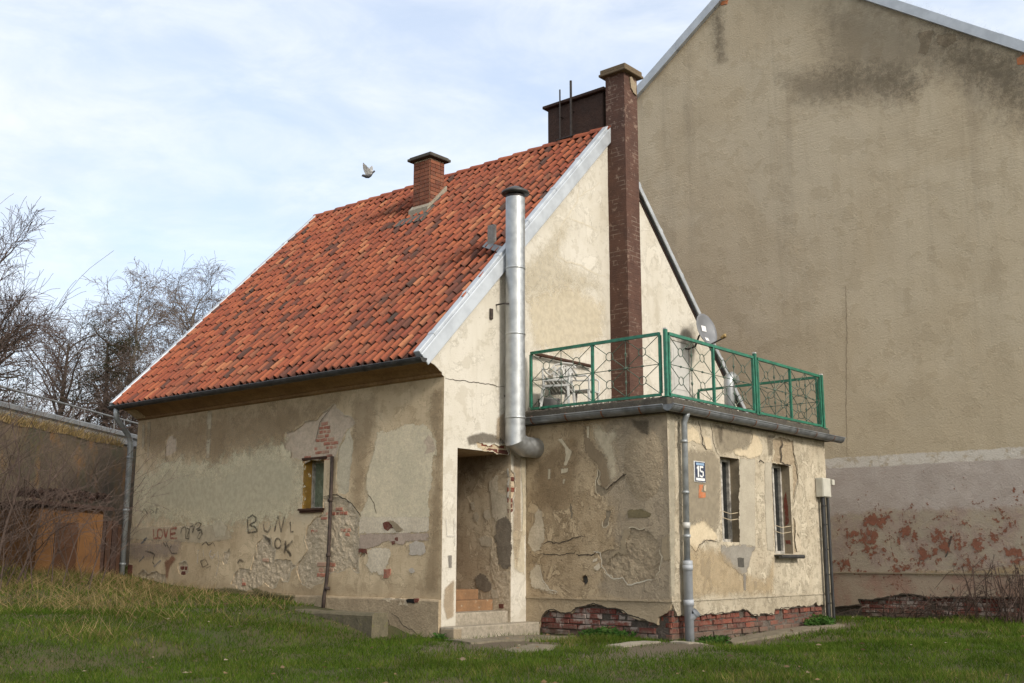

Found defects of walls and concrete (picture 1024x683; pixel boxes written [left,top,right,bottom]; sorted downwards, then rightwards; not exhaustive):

flaking render [687,427,712,450]
peeling [134,403,438,591]
flaking render [470,472,516,522]
flaking render [733,432,801,553]
flaking render [478,536,511,611]
flaking render [528,509,556,594]
crack [540,536,596,556]
flaking render [584,509,662,586]
peeling [690,520,718,590]
peeling [831,487,1024,619]
flaking render [539,603,822,642]